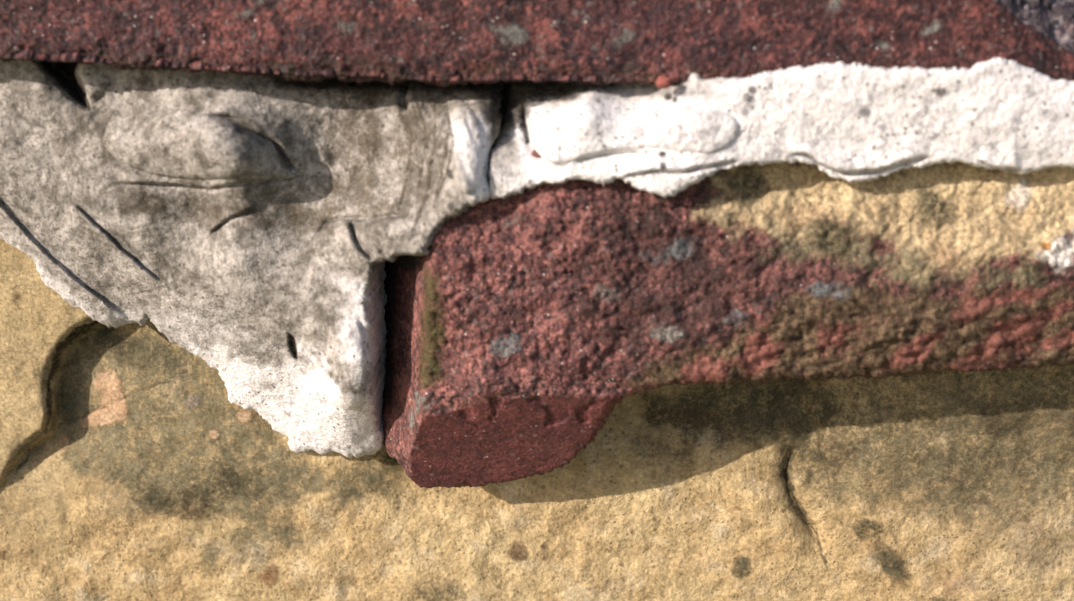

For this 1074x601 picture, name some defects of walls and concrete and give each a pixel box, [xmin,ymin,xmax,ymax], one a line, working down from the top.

crack [2,321,184,472]
damp [76,328,176,368]
damp [151,464,257,519]
damp [643,378,835,483]
crack [778,379,826,566]
damp [876,546,909,580]